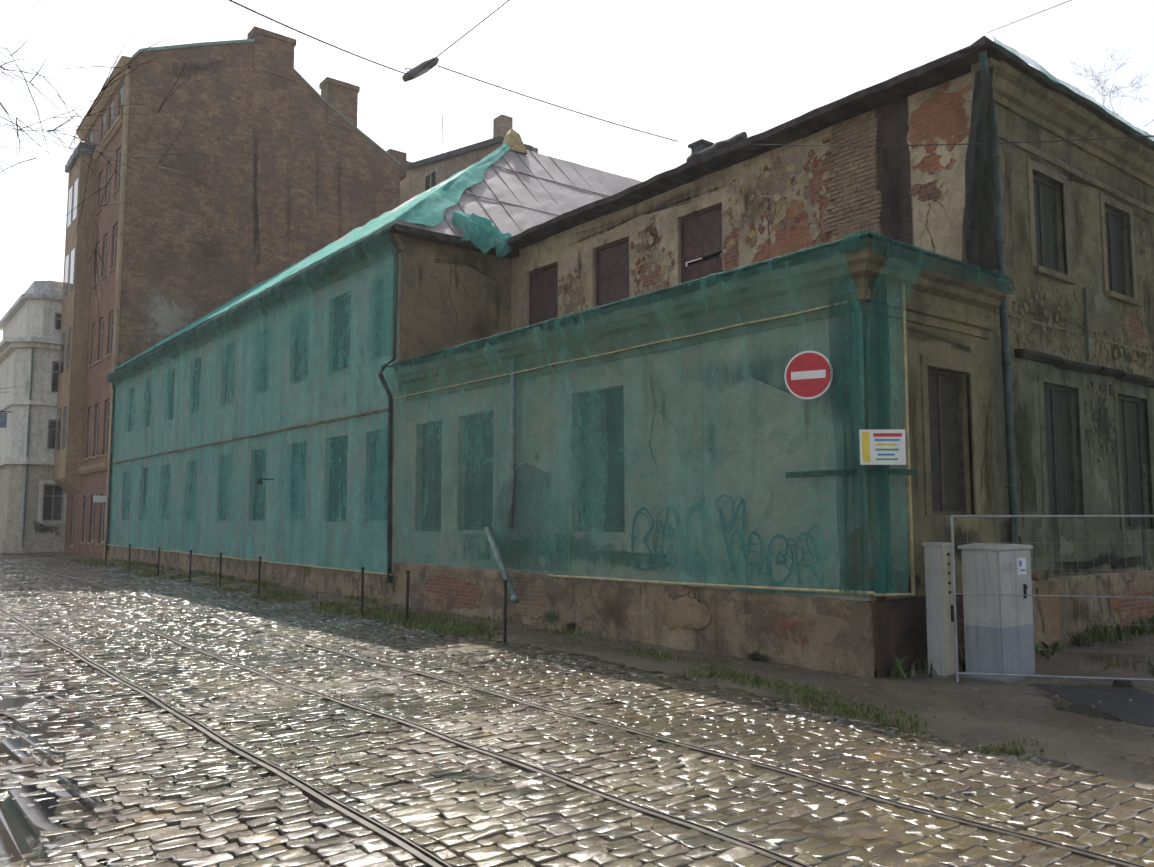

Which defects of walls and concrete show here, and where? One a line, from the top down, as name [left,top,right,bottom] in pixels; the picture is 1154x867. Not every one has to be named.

spalling [907,80,973,206]
spalling [557,269,588,316]
flaking render [630,215,675,297]
flaking render [719,147,838,272]